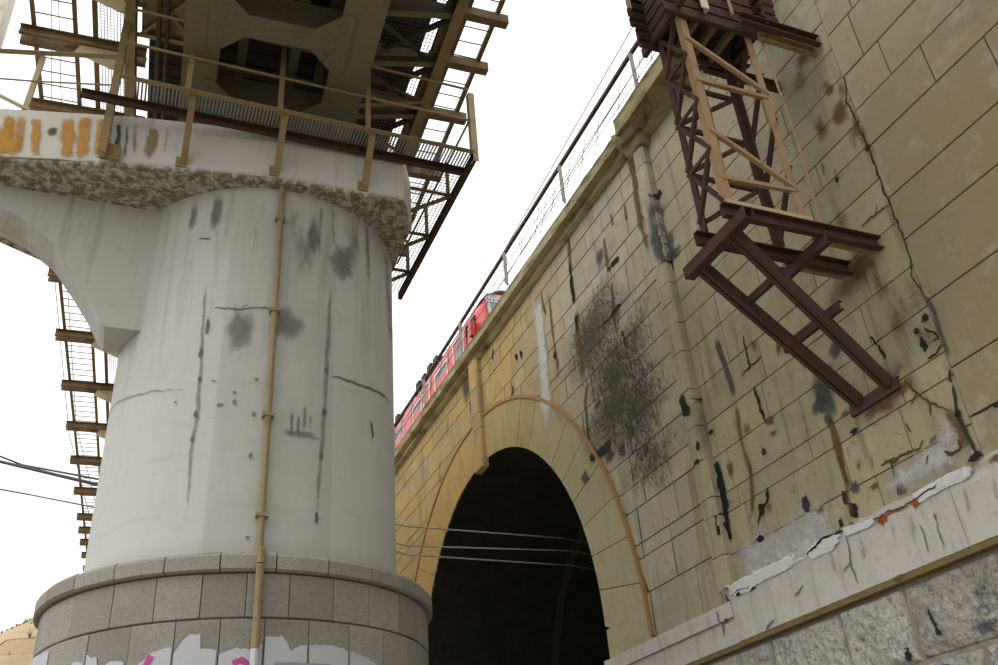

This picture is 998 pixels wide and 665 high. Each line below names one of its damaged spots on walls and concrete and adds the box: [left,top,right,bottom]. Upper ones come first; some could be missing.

crack [844,75,998,496]
crack [108,389,172,414]
water stain [569,277,702,495]
peeling [718,419,971,600]
rust [877,499,918,526]